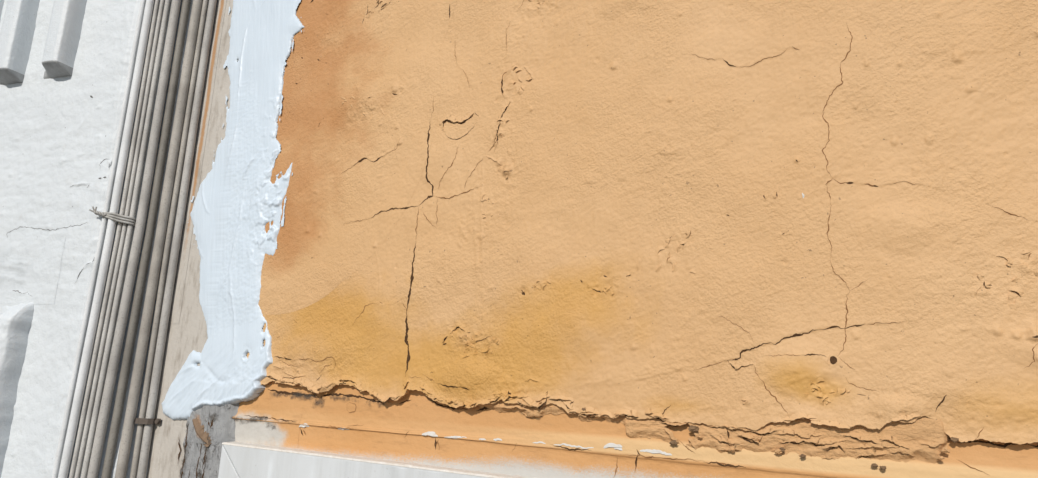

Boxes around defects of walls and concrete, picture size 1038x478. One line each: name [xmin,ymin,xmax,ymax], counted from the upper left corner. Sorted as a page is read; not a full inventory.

crack [244,0,524,435]
flaking render [266,364,959,470]
crack [696,23,917,418]